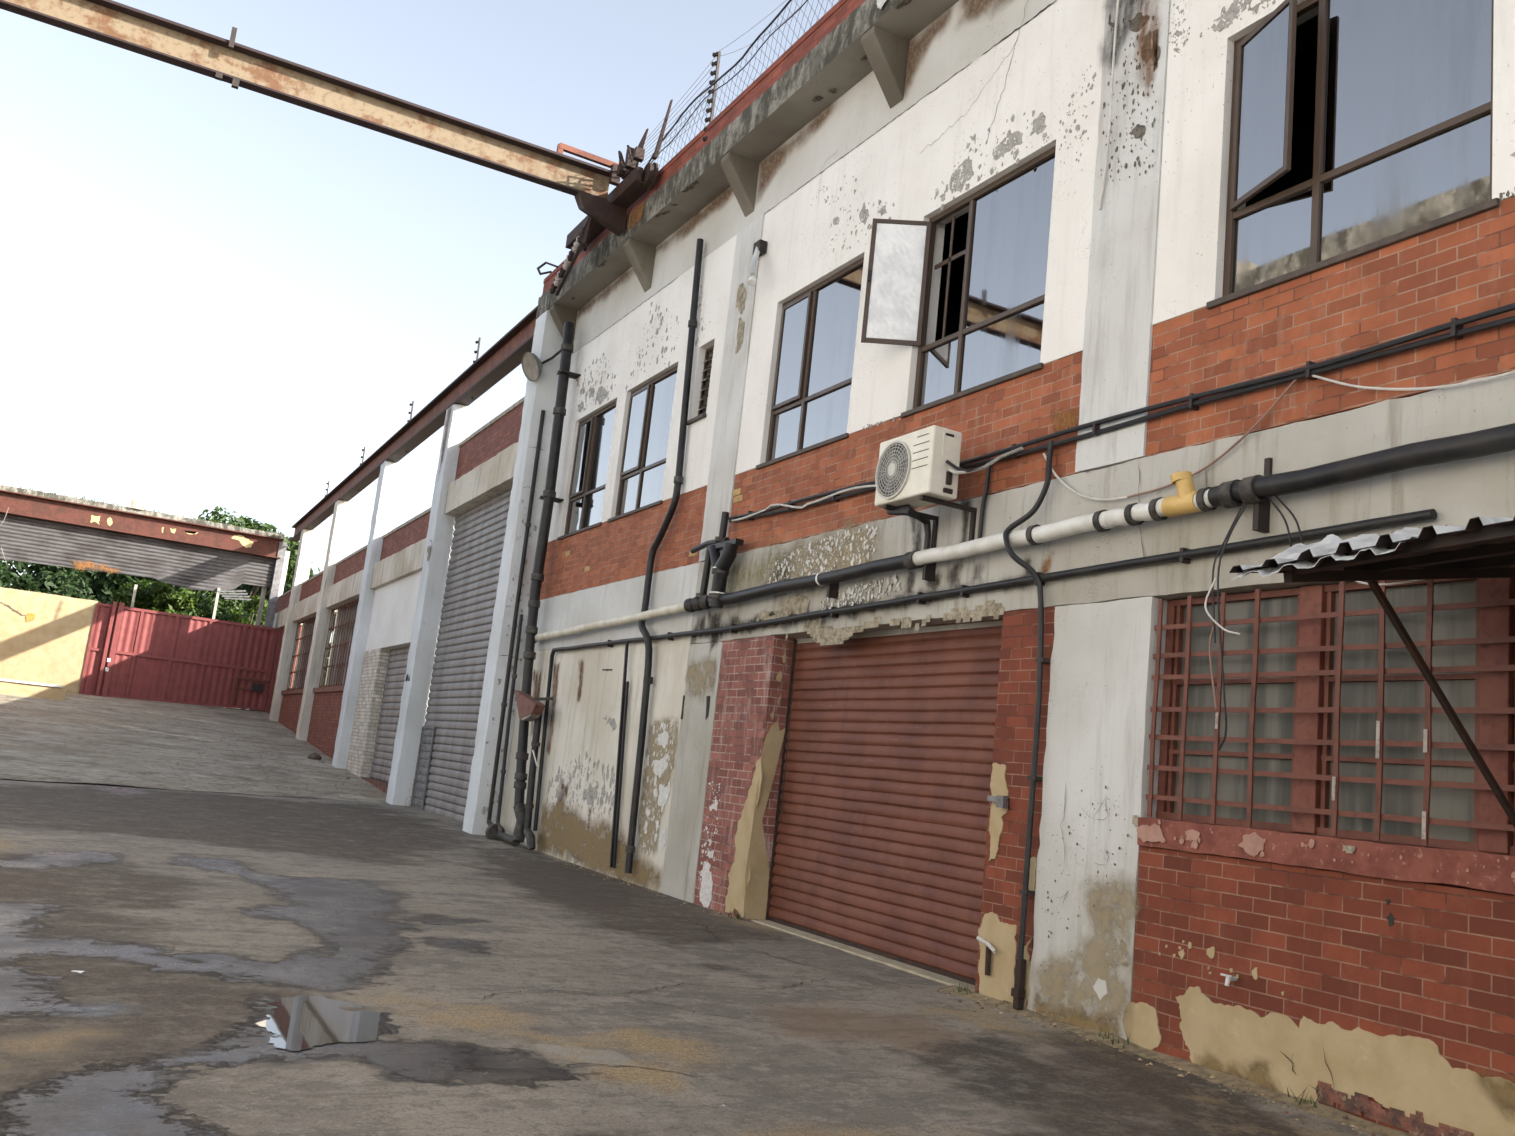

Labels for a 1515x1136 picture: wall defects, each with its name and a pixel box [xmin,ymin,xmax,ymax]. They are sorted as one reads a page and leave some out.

peeling [931,0,1276,210]
rust [1138,1,1156,86]
peeling [576,285,710,413]
leakage [537,799,660,888]
peeling [639,695,685,854]
peeling [725,525,1004,920]
peeling [989,763,1009,861]
leakage [1035,882,1136,1037]
peeling [978,785,1213,1008]
peeling [1238,832,1266,857]
peeling [1301,839,1370,863]
peeling [1123,1001,1162,1050]